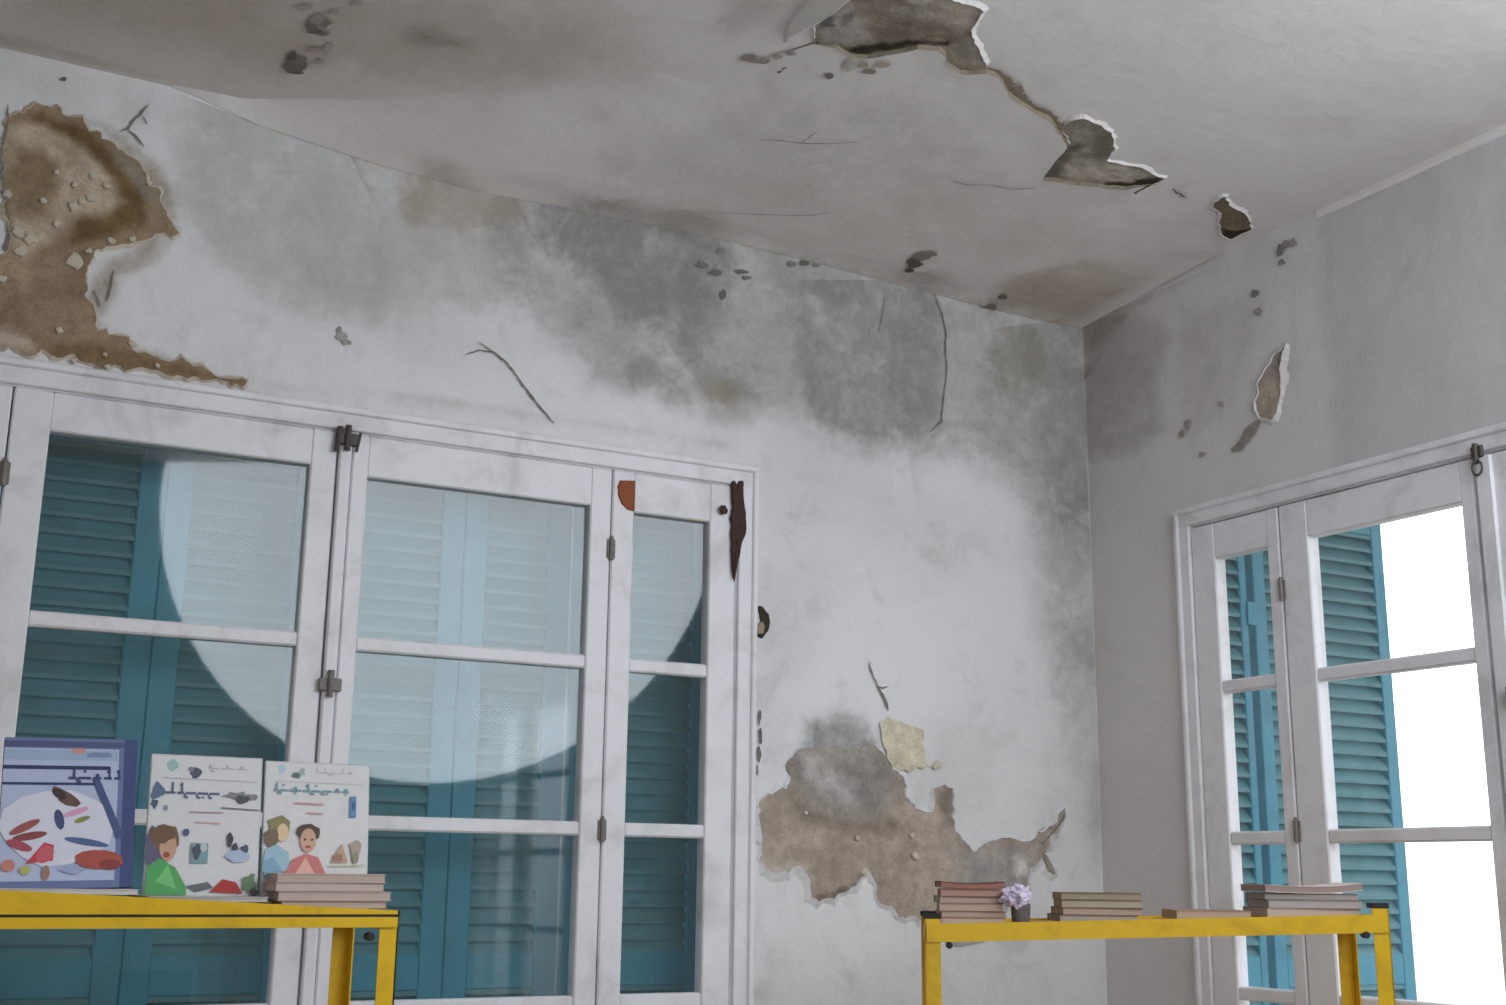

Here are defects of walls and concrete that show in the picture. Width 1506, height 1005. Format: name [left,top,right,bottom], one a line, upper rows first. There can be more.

flaking render [741,0,990,79]
flaking render [1045,114,1169,195]
flaking render [0,101,249,391]
damp [685,248,752,300]
damp [777,260,820,286]
flaking render [1210,194,1254,240]
crack [466,342,554,423]
flaking render [1231,343,1290,453]
rust [617,480,635,511]
flaking render [757,606,770,639]
flaking render [755,710,1067,928]